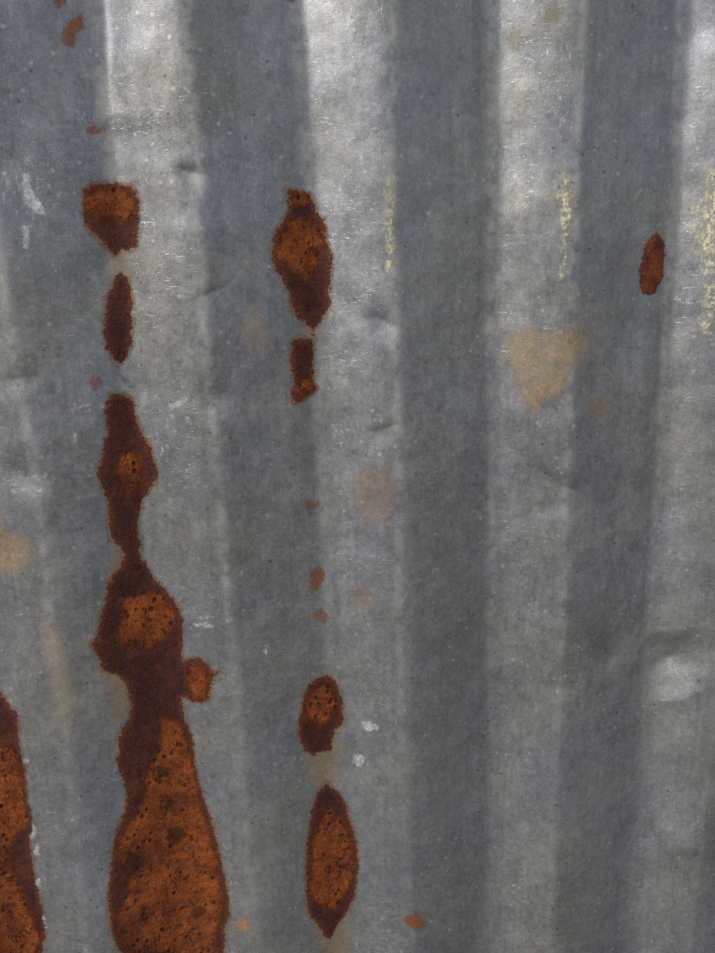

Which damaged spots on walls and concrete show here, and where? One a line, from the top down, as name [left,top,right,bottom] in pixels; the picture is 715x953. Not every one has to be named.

rust [79,180,141,257]
rust [101,271,135,365]
rust [270,187,334,405]
rust [638,231,665,295]
rust [89,393,248,953]
rust [297,675,348,757]
rust [0,692,48,953]
rust [303,780,360,939]